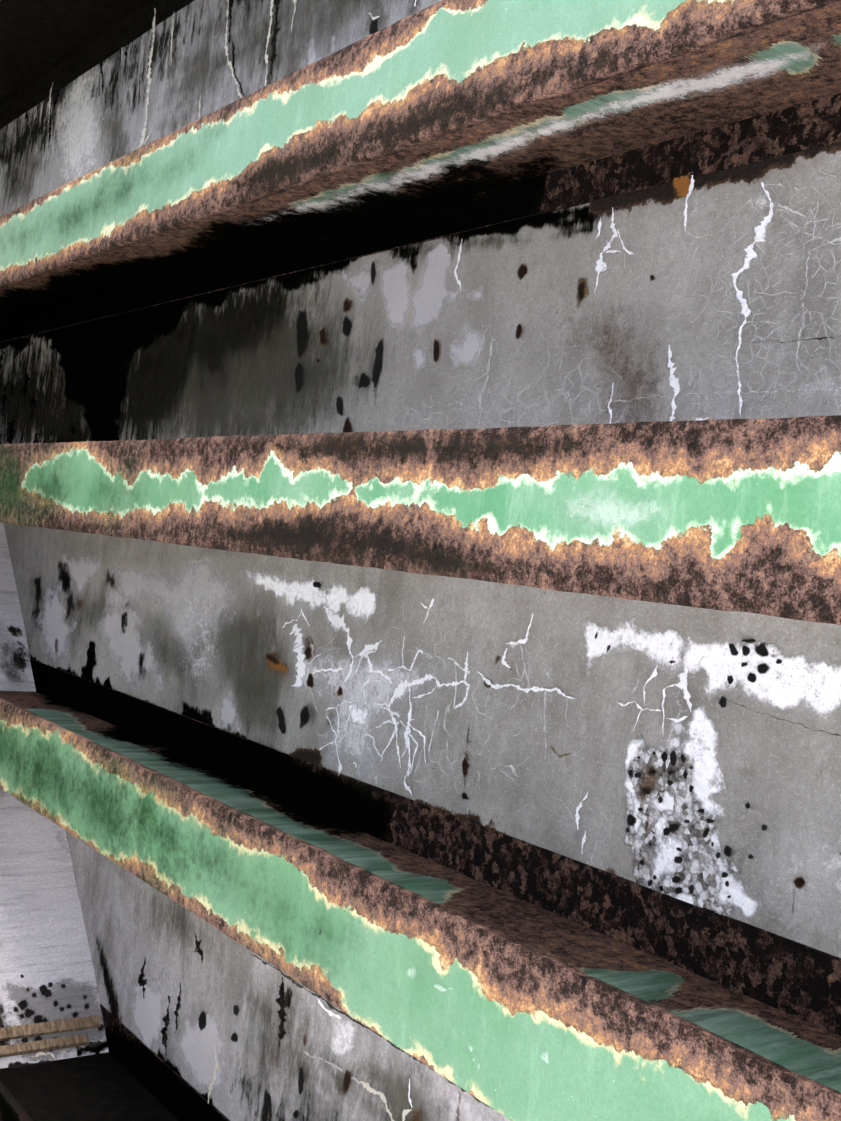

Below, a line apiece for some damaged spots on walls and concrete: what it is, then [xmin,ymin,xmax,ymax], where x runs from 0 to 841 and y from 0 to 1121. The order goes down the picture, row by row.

water stain [0,0,375,203]
crack [224,0,298,98]
peeling [0,0,734,271]
rust [588,142,841,216]
crack [382,152,841,431]
peeling [21,447,841,559]
water stain [0,562,439,843]
rust [304,637,314,659]
crack [283,598,576,796]
peeling [0,708,796,1121]
rust [792,876,805,915]
water stain [96,938,227,1121]